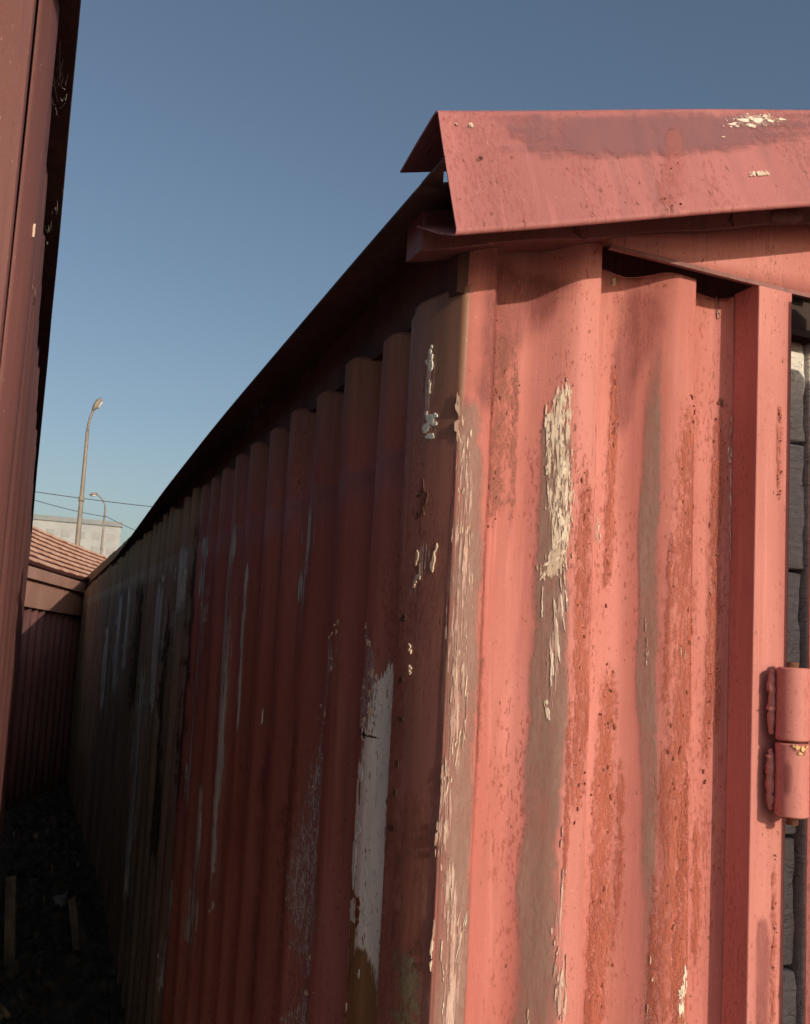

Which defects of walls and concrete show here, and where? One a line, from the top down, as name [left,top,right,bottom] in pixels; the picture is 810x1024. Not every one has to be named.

water stain [516,114,808,156]
peeling [723,113,787,129]
peeling [347,622,394,1007]
rust [345,600,407,1024]
peeling [410,543,438,594]
peeling [422,345,438,442]
peeling [435,392,473,902]
rust [476,319,520,787]
peeling [536,378,575,620]
rust [563,365,626,1024]
peeling [677,964,687,1024]
rust [643,394,726,1024]